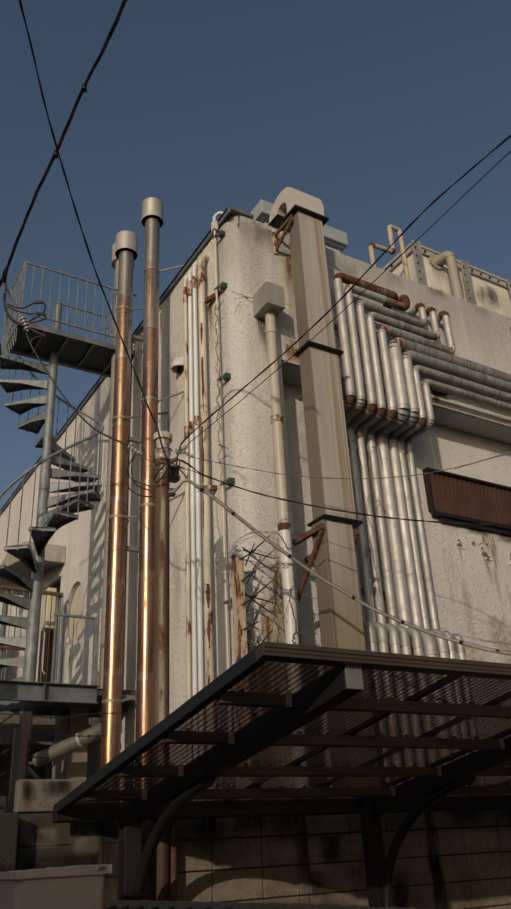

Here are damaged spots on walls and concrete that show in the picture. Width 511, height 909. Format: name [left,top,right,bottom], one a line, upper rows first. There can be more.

spalling [455,539,493,562]